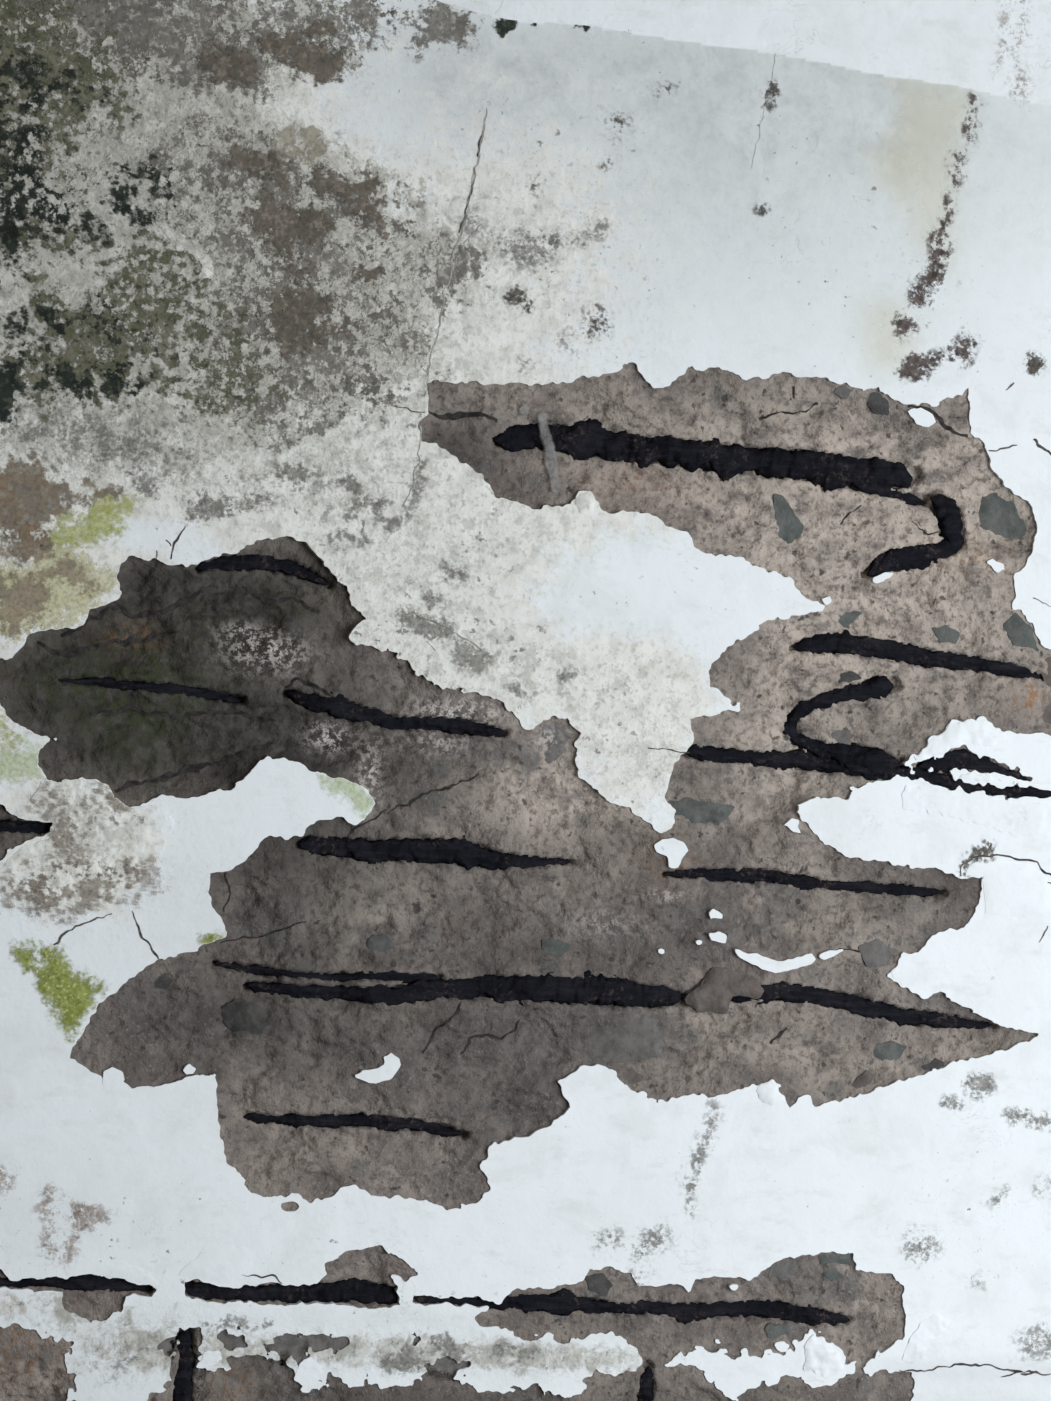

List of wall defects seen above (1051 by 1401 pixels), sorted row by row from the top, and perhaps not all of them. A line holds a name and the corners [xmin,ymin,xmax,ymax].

damp [0,0,487,451]
crack [395,108,488,505]
damp [0,295,192,637]
damp [324,499,371,547]
damp [384,460,427,533]
crack [908,405,1051,455]
spalling [0,362,1051,1211]
crack [960,845,1051,884]
spalling [0,1323,77,1401]
spalling [0,1269,155,1322]
spalling [147,1245,914,1401]
crack [899,1363,1050,1377]